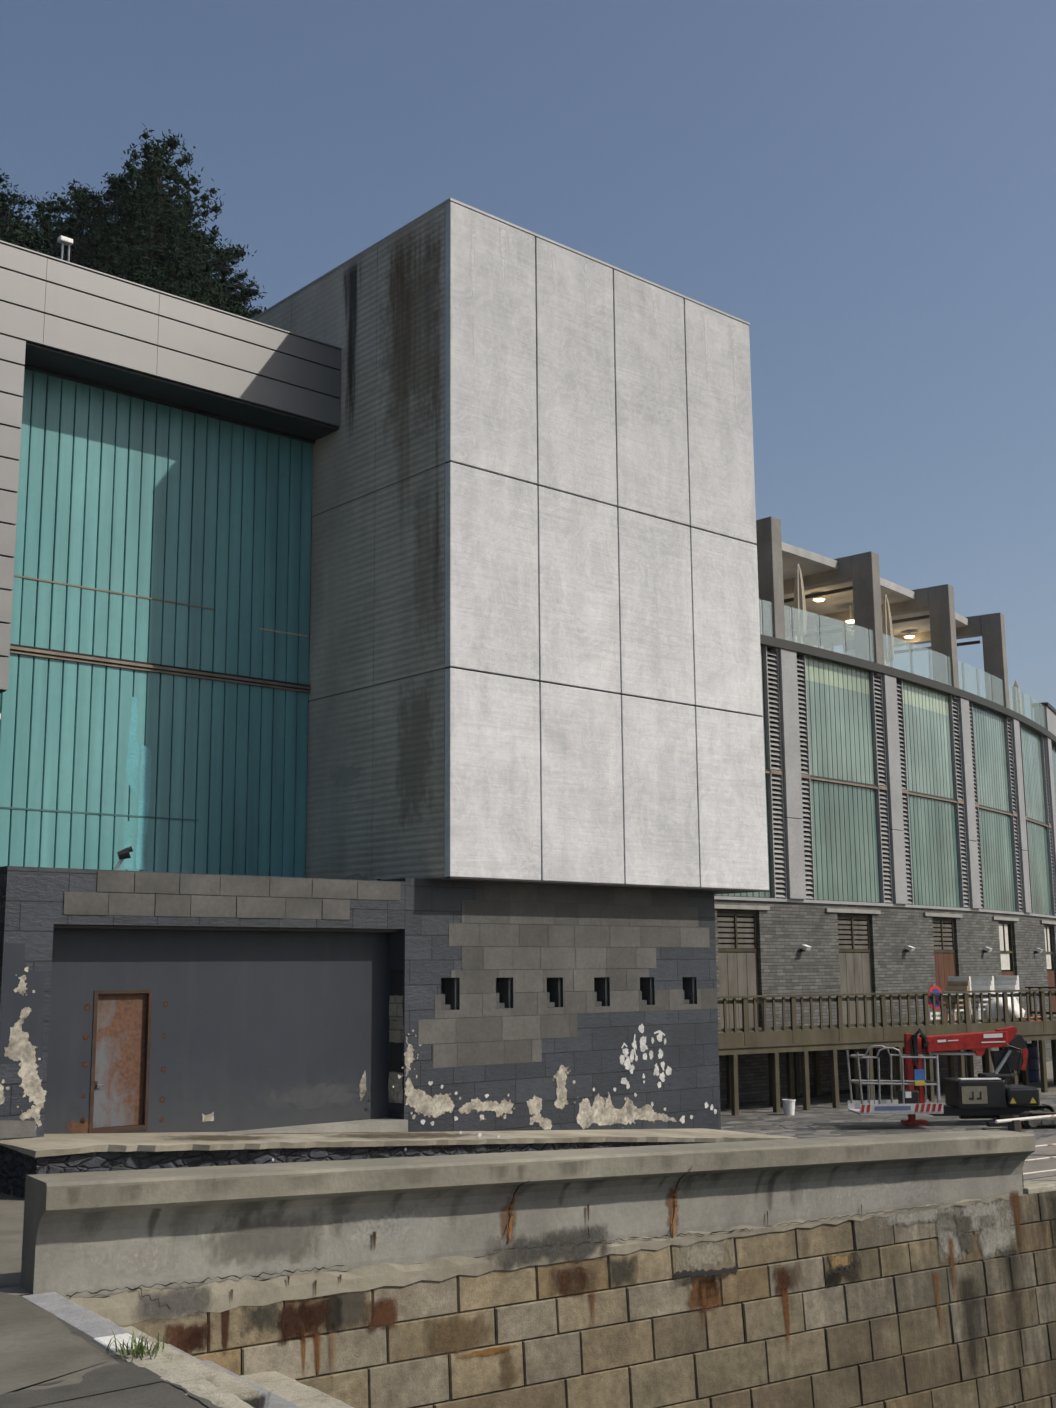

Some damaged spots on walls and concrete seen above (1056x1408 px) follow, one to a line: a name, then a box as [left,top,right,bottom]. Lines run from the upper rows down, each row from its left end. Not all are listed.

damp [345,265,357,411]
peeling [0,943,47,1139]
peeling [388,931,717,1138]
damp [142,1286,210,1319]
rust [166,1289,233,1355]
damp [246,1303,279,1331]
rust [279,1275,398,1374]
damp [490,1225,637,1287]
rust [553,1263,595,1315]
rust [773,1267,799,1344]
damp [962,1281,976,1364]